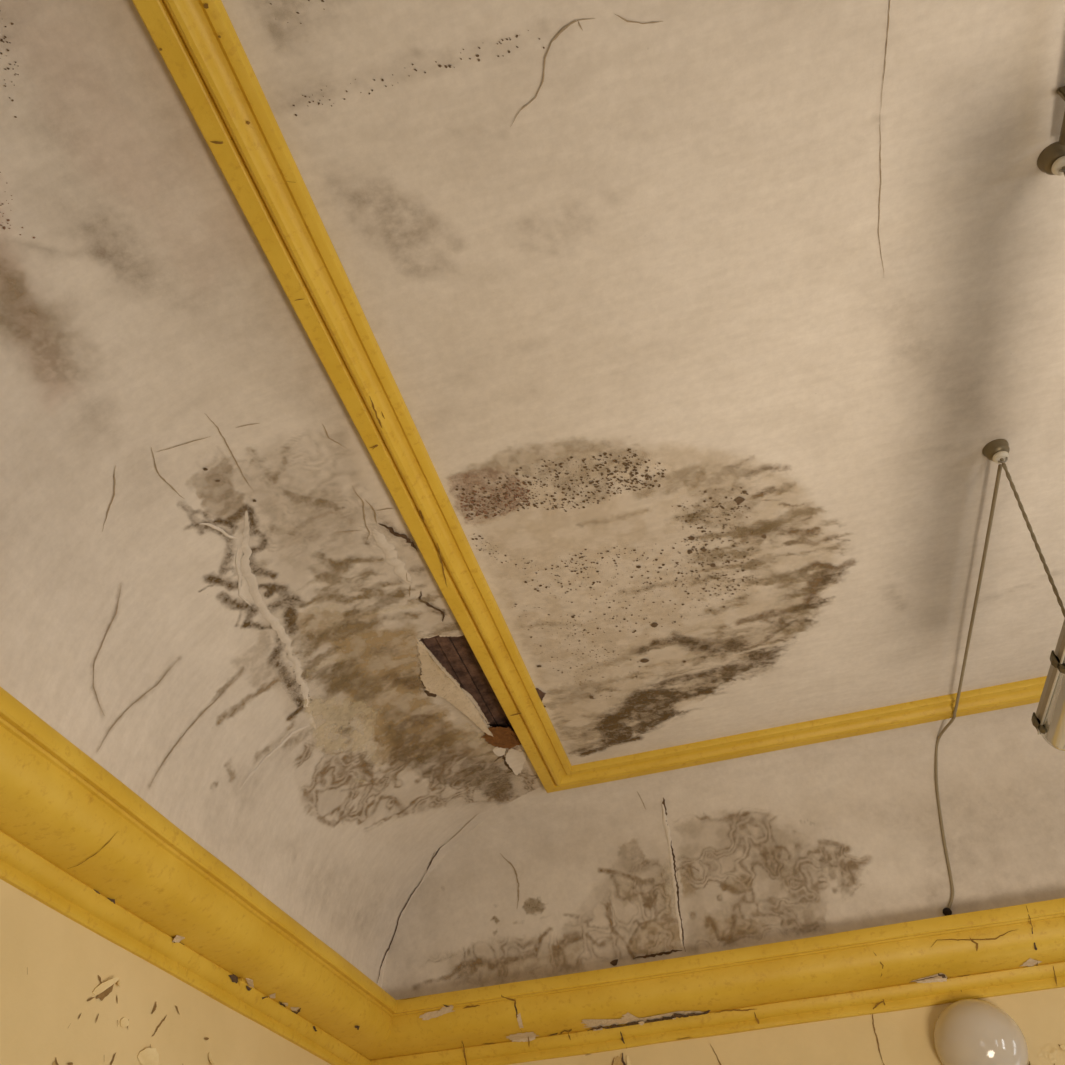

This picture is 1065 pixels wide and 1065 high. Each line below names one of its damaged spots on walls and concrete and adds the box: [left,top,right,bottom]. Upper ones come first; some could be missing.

crack [511,14,663,126]
crack [878,0,890,270]
water stain [455,449,666,520]
water stain [290,558,533,825]
flaking render [415,635,526,775]
water stain [472,487,844,756]
crack [377,819,472,982]
water stain [501,854,543,911]
crack [610,792,686,966]
peeling [87,975,121,1004]
spalling [228,974,301,1014]
crack [490,988,759,1065]